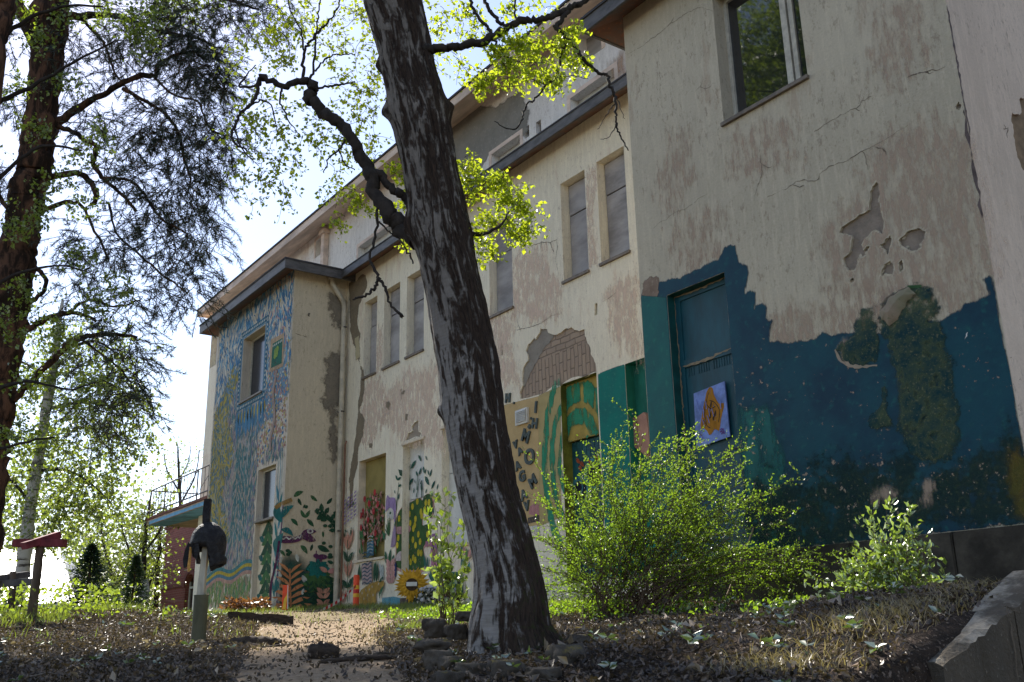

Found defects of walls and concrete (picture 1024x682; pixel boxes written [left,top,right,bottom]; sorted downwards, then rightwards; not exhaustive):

crack [755,125,908,196]
spalling [1011,99,1024,170]
spalling [841,183,925,282]
flaking render [490,245,596,399]